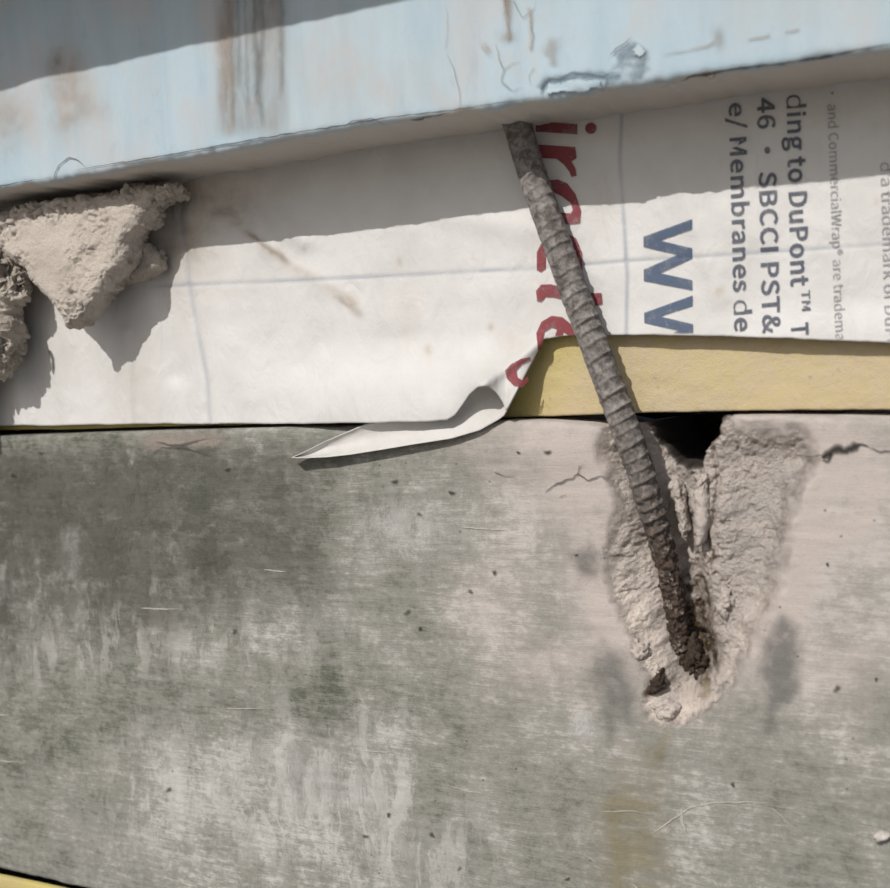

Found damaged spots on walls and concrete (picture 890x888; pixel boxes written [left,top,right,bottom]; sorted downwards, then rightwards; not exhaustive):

peeling [611,37,646,77]
peeling [539,71,620,95]
spalling [146,432,226,456]
crack [804,443,890,463]
spalling [600,411,815,728]